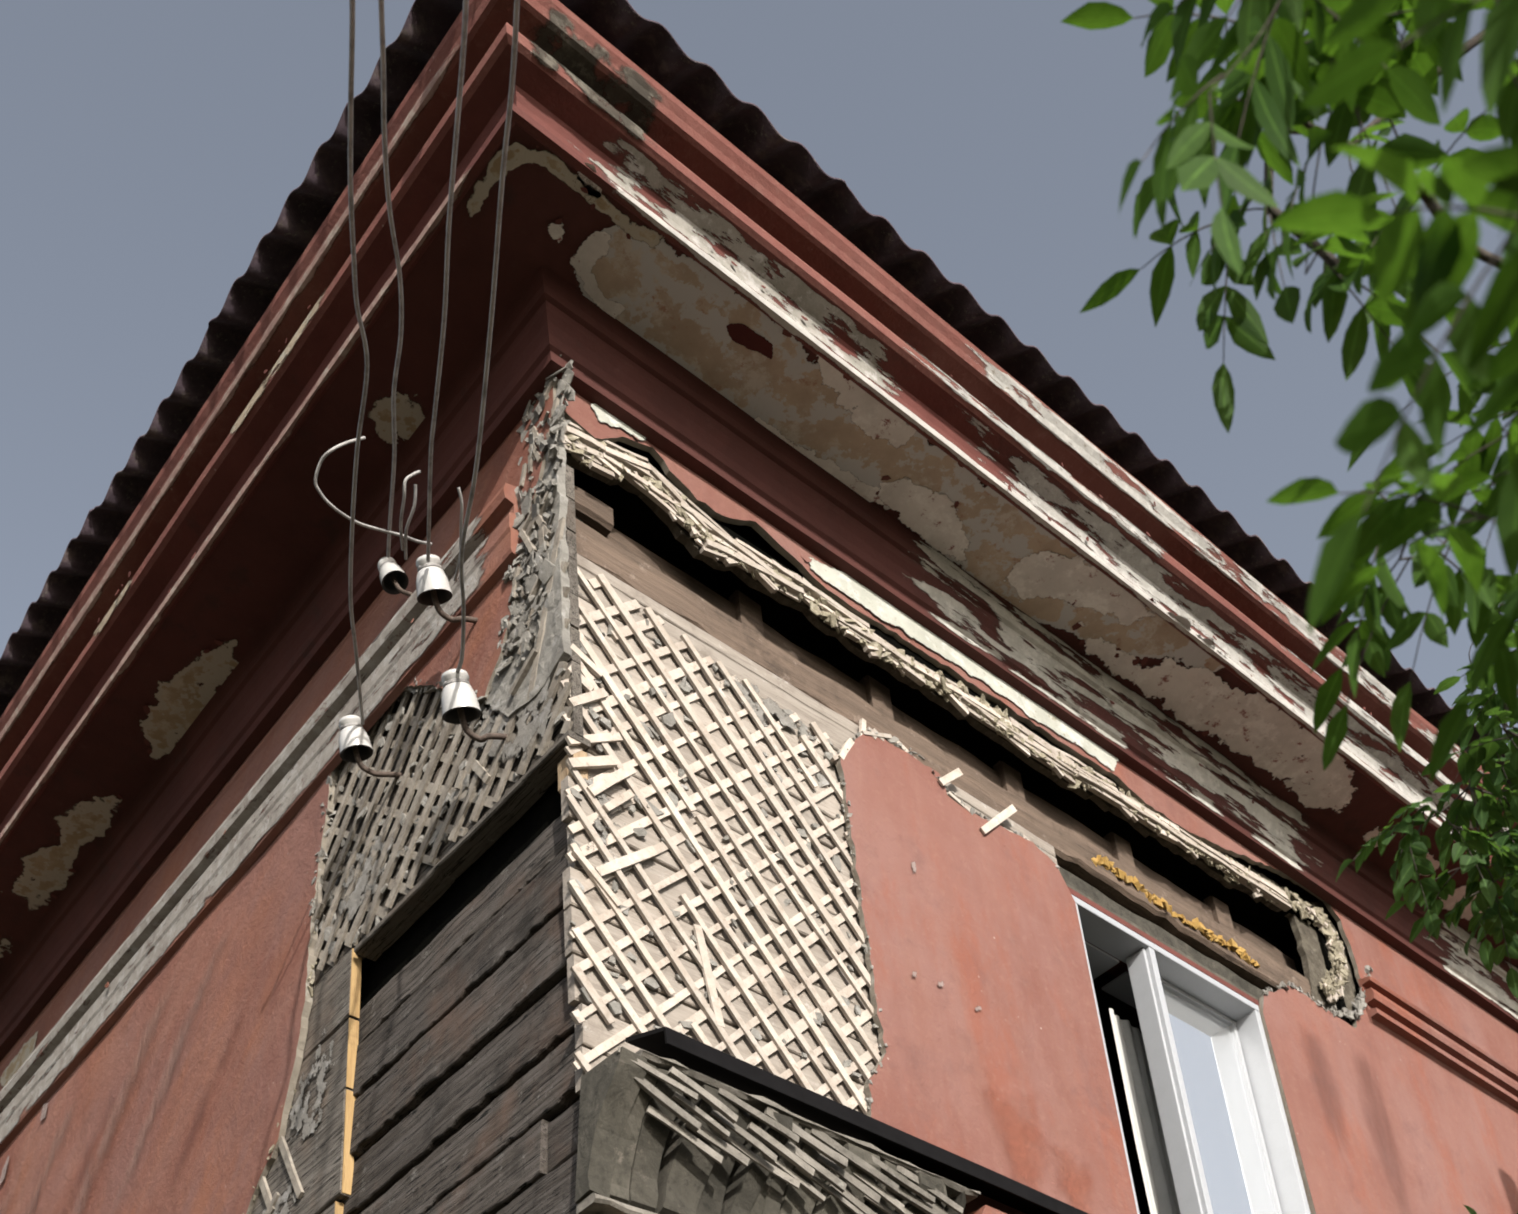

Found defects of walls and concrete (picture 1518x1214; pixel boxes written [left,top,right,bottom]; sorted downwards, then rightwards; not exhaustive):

peeling [0,512,488,1184]
peeling [0,44,1473,1021]
flaking render [853,882,888,1110]
peeling [1423,885,1518,1019]